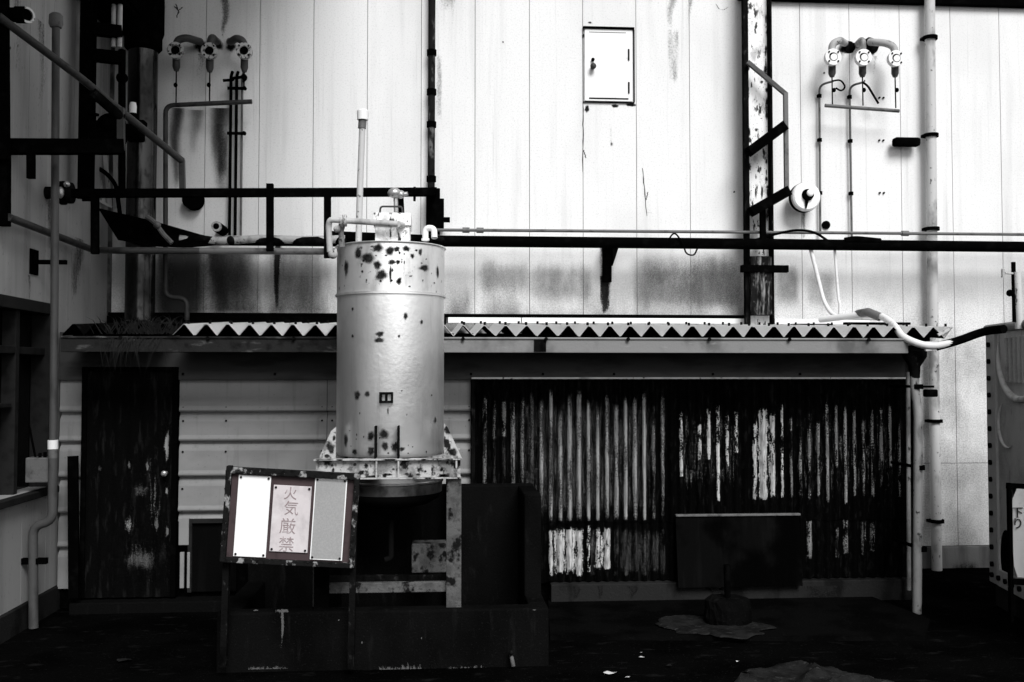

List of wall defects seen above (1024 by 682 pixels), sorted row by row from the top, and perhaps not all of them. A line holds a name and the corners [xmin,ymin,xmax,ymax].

damp [171,108,183,177]
damp [213,108,228,177]
damp [157,254,250,313]